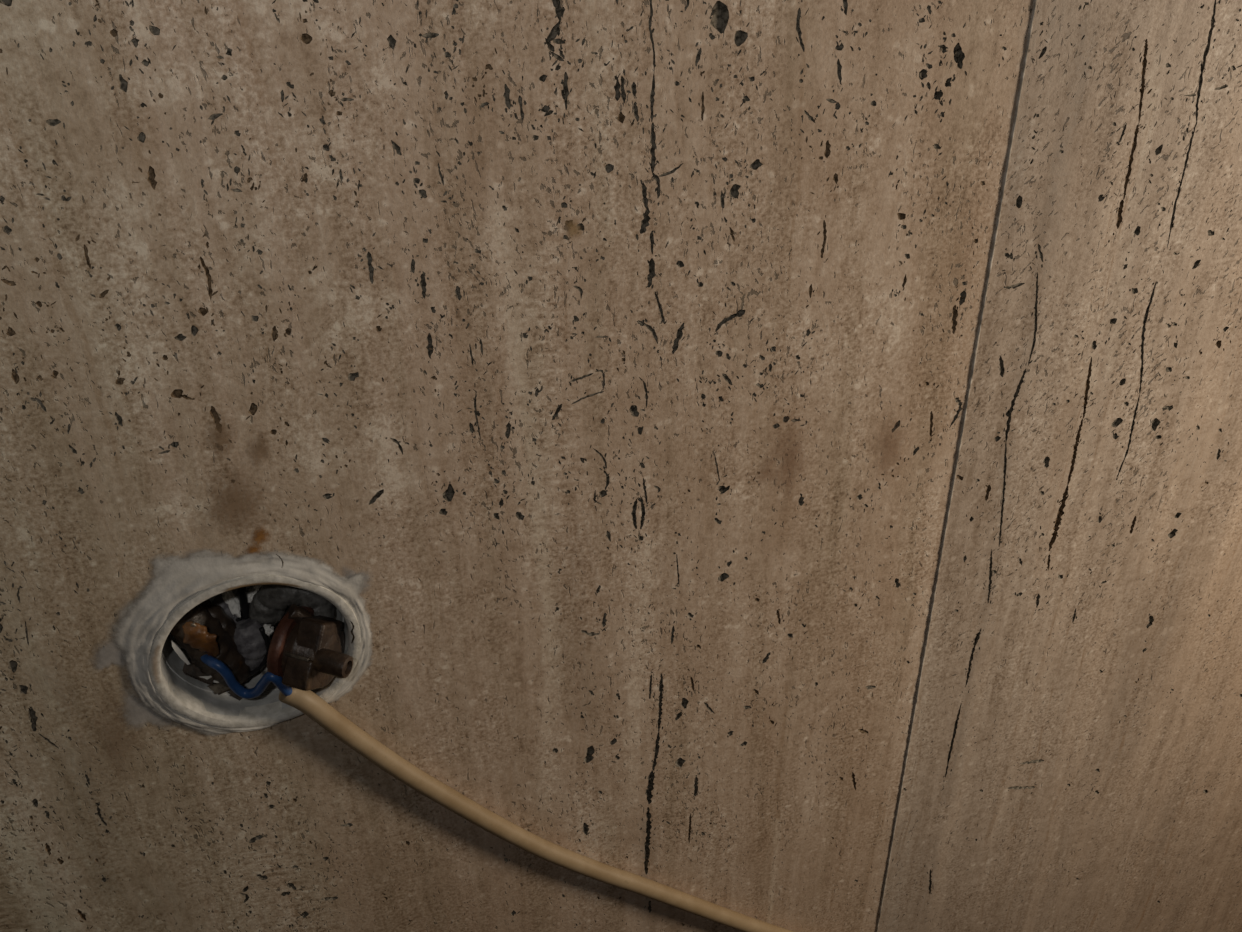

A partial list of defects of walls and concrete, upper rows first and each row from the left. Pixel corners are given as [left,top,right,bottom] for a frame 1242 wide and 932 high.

crack [640,0,683,324]
crack [643,673,664,913]